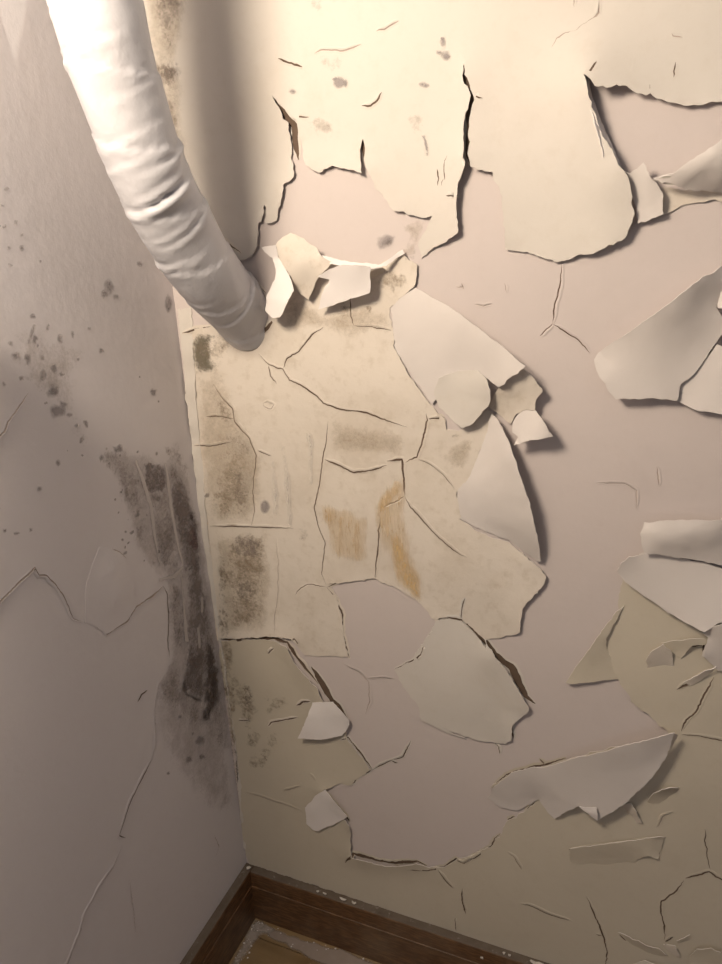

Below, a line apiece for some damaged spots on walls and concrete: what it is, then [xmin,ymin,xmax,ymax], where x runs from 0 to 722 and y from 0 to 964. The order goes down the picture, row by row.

peeling [143,0,722,262]
leakage [194,337,212,370]
leakage [114,450,231,718]
peeling [192,233,722,964]
crack [0,565,170,964]
crack [521,829,722,964]